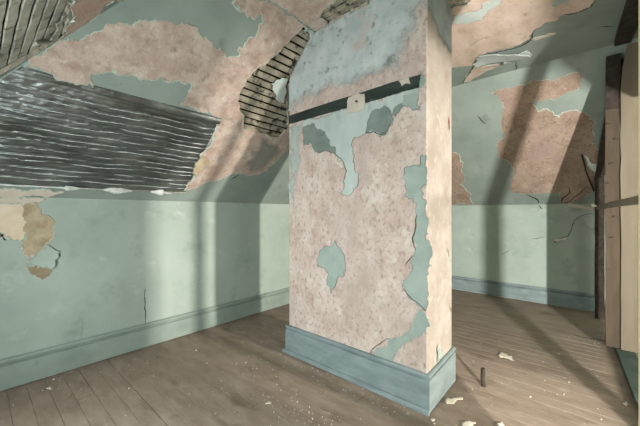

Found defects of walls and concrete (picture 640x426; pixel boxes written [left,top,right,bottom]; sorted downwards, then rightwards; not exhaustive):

peeling [0,0,599,206]
peeling [0,188,64,281]